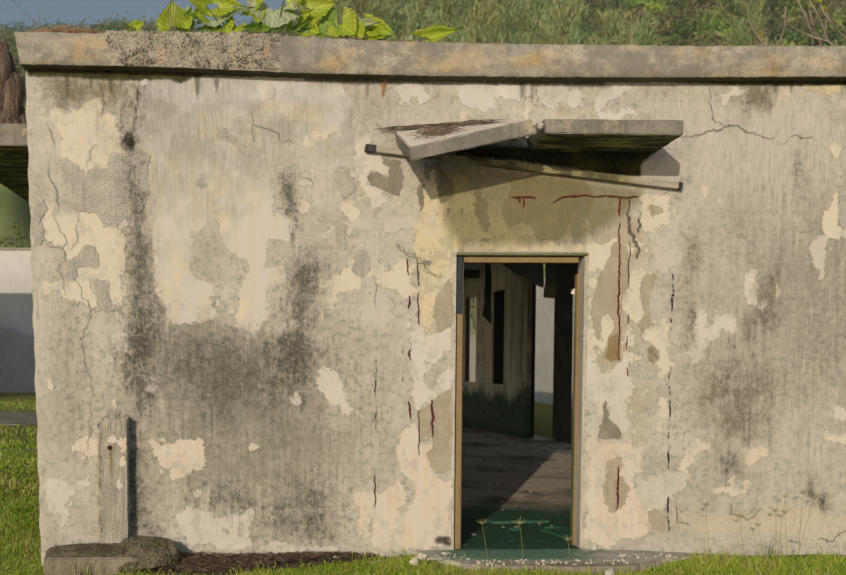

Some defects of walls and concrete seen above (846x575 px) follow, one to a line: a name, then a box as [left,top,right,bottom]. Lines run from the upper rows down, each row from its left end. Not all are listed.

peeling [456,81,584,112]
crack [680,87,767,138]
peeling [31,30,404,366]
leakage [125,165,155,405]
leakage [271,261,319,383]
peeling [313,162,714,553]
rust [607,335,619,360]
leakage [702,372,773,438]
leakage [129,430,161,535]
peeling [148,437,207,480]
peeling [175,489,338,554]
leakage [274,487,333,539]